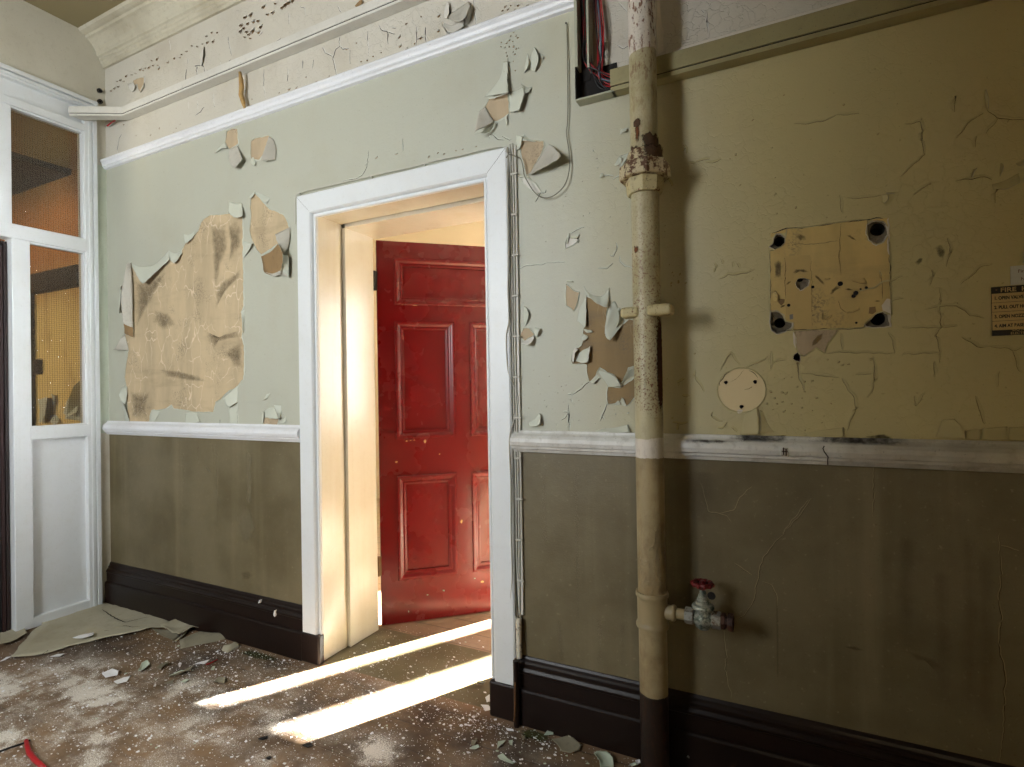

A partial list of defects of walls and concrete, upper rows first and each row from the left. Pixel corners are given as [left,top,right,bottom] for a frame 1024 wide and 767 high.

crack [169,41,232,115]
crack [263,25,427,99]
peeling [428,32,544,158]
peeling [516,133,576,194]
rust [631,118,663,157]
crack [900,118,929,194]
crack [713,194,883,305]
hole [865,220,888,246]
peeling [113,191,290,425]
peeling [565,280,634,407]
hole [769,310,793,335]
crack [673,238,1023,432]